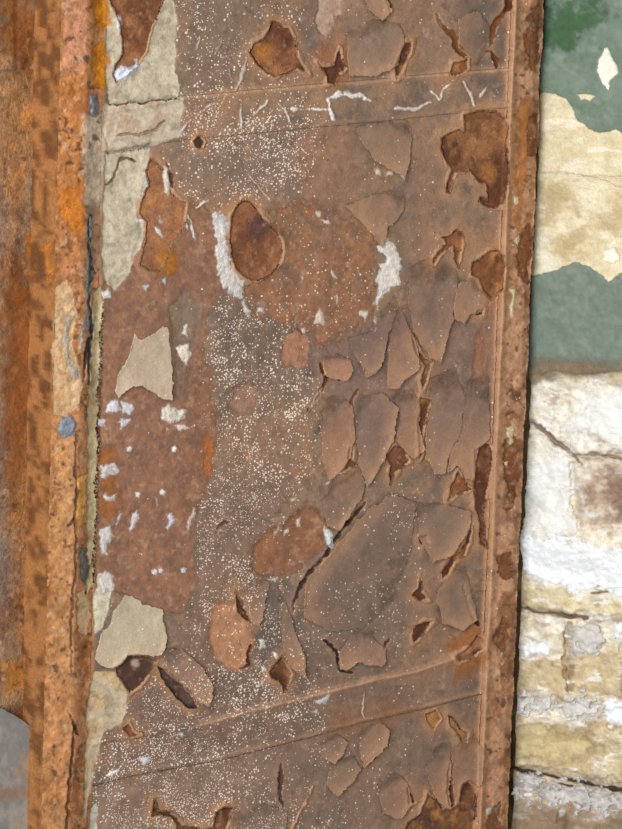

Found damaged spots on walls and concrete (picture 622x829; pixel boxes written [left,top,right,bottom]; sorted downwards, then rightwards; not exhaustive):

peeling [249,0,417,89]
peeling [539,0,622,133]
corrosion [59,188,84,235]
peeling [440,110,512,211]
corrosion [3,236,56,475]
peeling [528,262,622,372]
peeling [51,0,222,829]
peeling [207,190,509,671]
crack [293,502,366,609]
crack [242,644,252,669]
crack [323,640,353,674]
peeling [377,708,485,829]